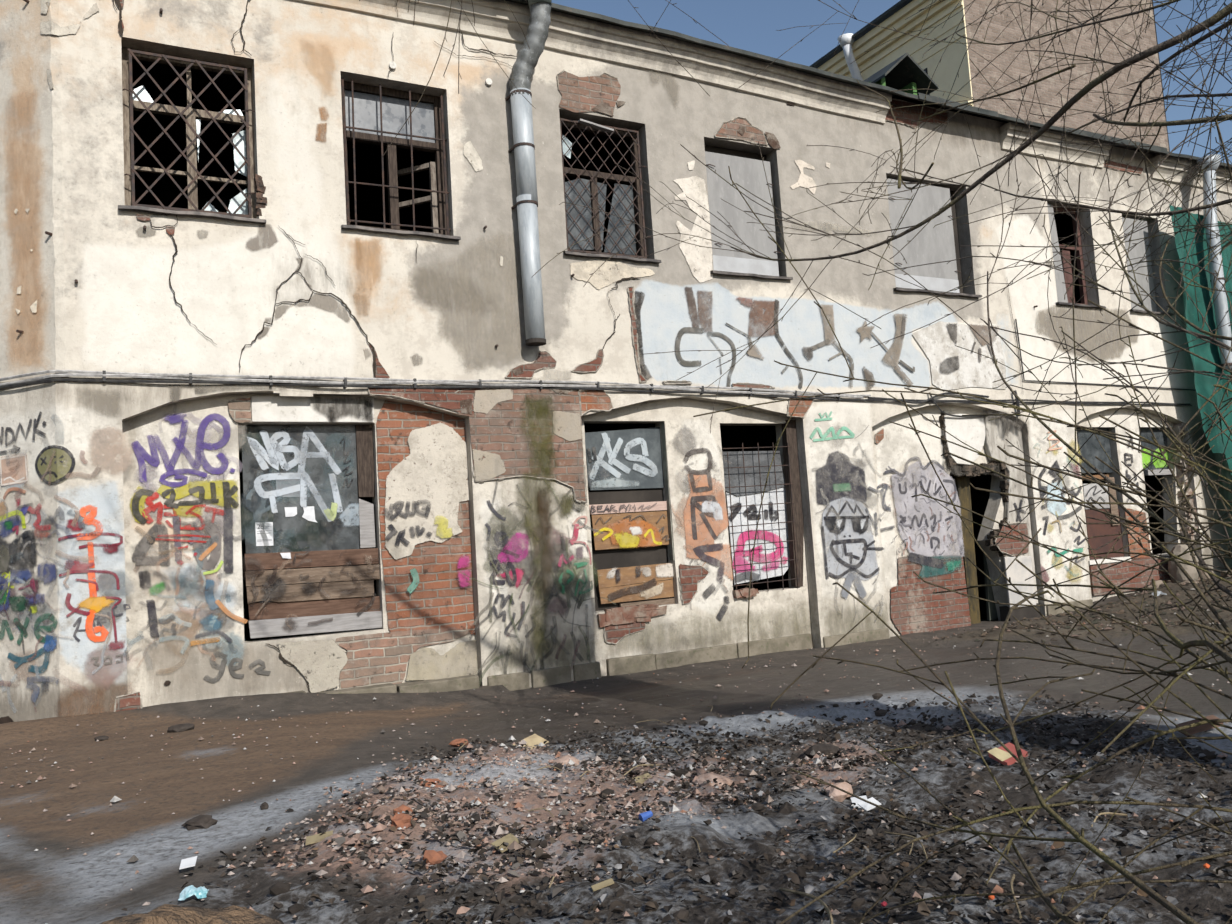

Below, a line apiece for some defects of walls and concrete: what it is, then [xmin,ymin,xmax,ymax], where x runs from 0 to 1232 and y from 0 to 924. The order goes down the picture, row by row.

crack [113,0,124,35]
crack [231,0,252,56]
spalling [557,69,625,117]
spalling [715,116,781,149]
peeling [790,160,830,194]
peeling [673,160,713,283]
crack [136,214,390,378]
peeling [368,348,614,560]
damp [538,494,573,570]